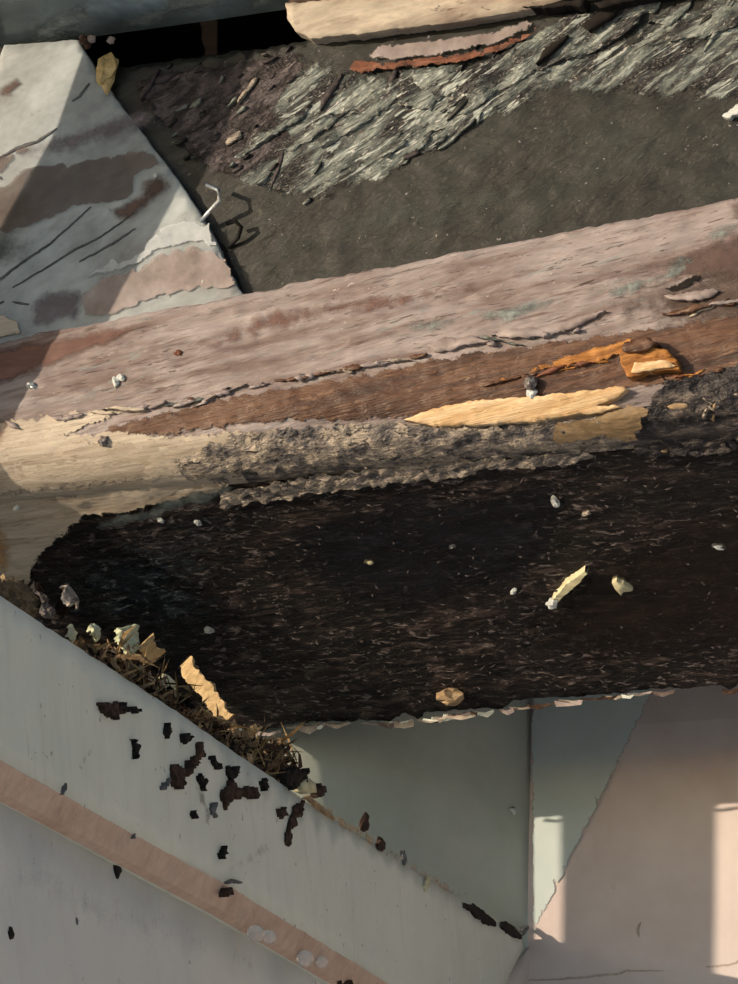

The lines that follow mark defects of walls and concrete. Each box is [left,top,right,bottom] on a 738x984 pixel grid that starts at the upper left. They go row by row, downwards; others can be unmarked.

peeling [74,0,738,205]
peeling [0,151,158,233]
peeling [81,221,234,315]
peeling [50,301,610,422]
peeling [646,363,738,423]
damp [68,535,205,633]
damp [103,487,230,527]
damp [302,487,560,600]
peeling [172,417,738,510]
damp [542,514,738,659]
crack [529,969,664,981]
crack [706,960,738,968]